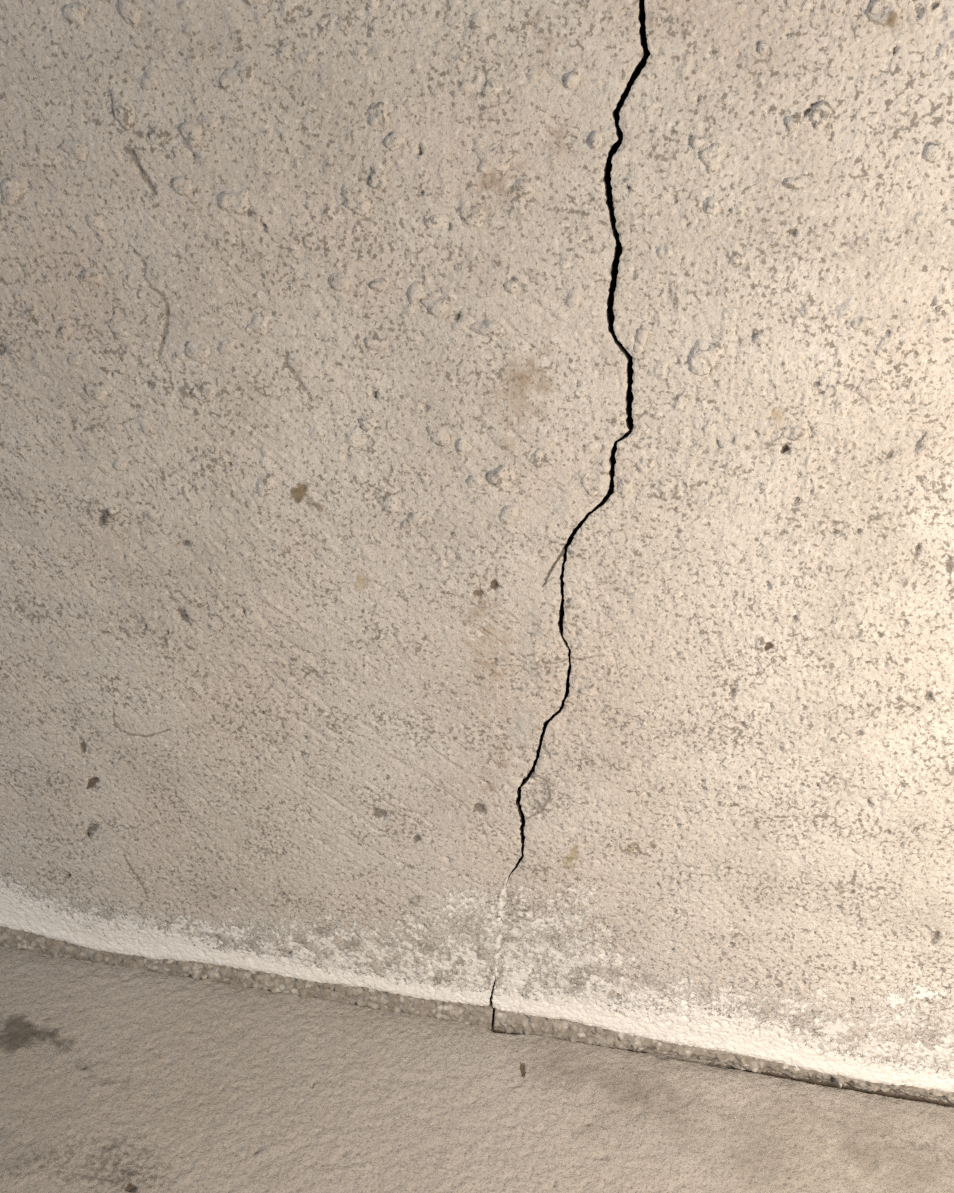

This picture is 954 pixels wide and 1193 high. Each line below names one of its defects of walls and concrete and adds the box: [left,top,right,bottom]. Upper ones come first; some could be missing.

crack [506,0,651,885]
crack [489,977,514,1034]